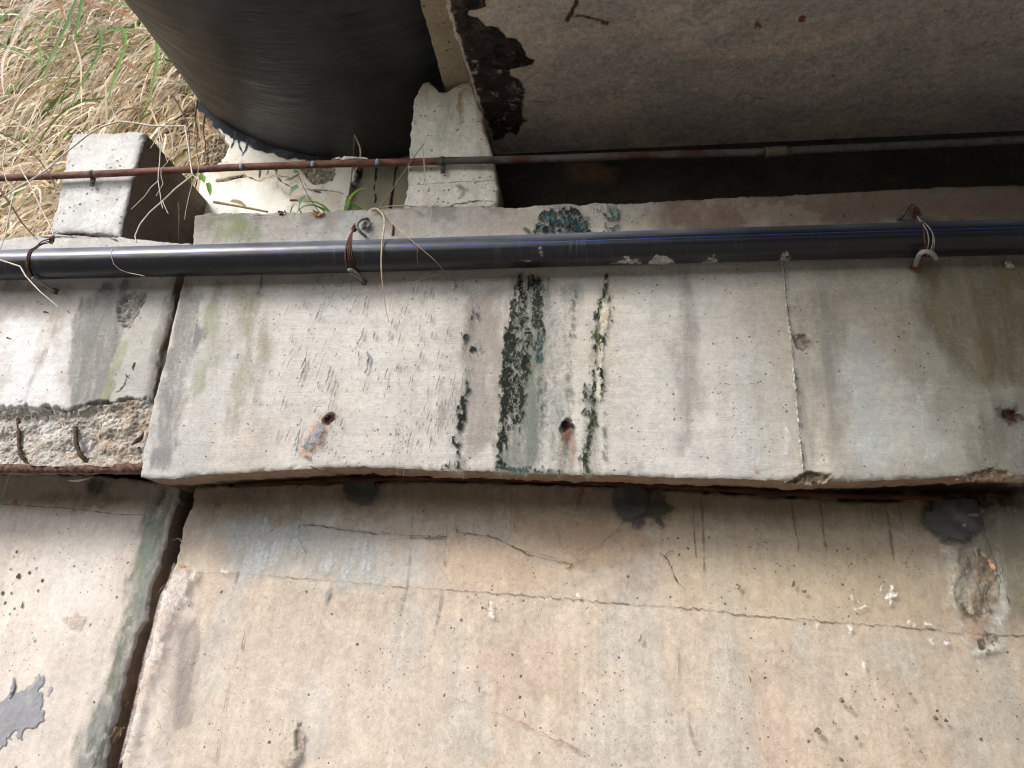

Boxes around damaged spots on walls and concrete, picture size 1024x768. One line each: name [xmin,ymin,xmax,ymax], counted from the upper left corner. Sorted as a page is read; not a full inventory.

spalling [0,362,154,474]
water stain [440,273,560,476]
water stain [578,274,614,474]
crack [298,523,612,569]
water stain [949,495,1024,654]
crack [982,529,1010,615]